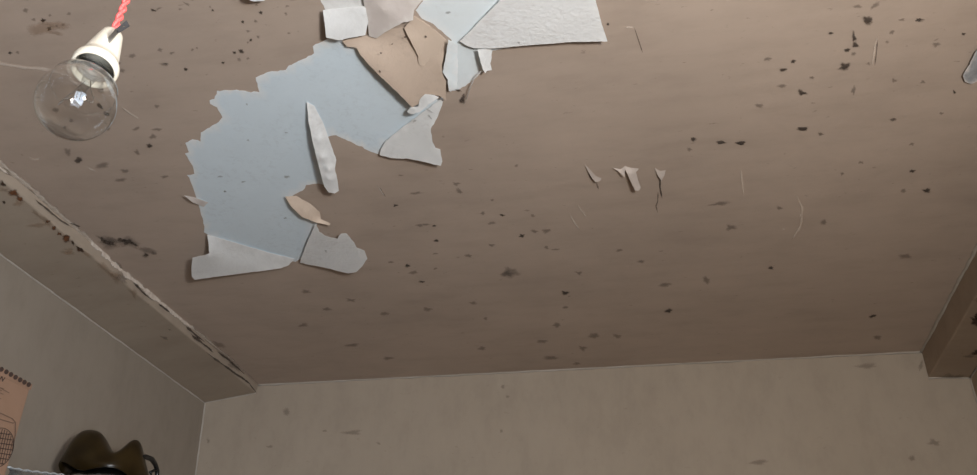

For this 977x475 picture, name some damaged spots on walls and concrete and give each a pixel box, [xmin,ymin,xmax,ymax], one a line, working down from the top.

peeling [184,0,607,280]
peeling [614,166,641,191]
peeling [655,168,666,210]